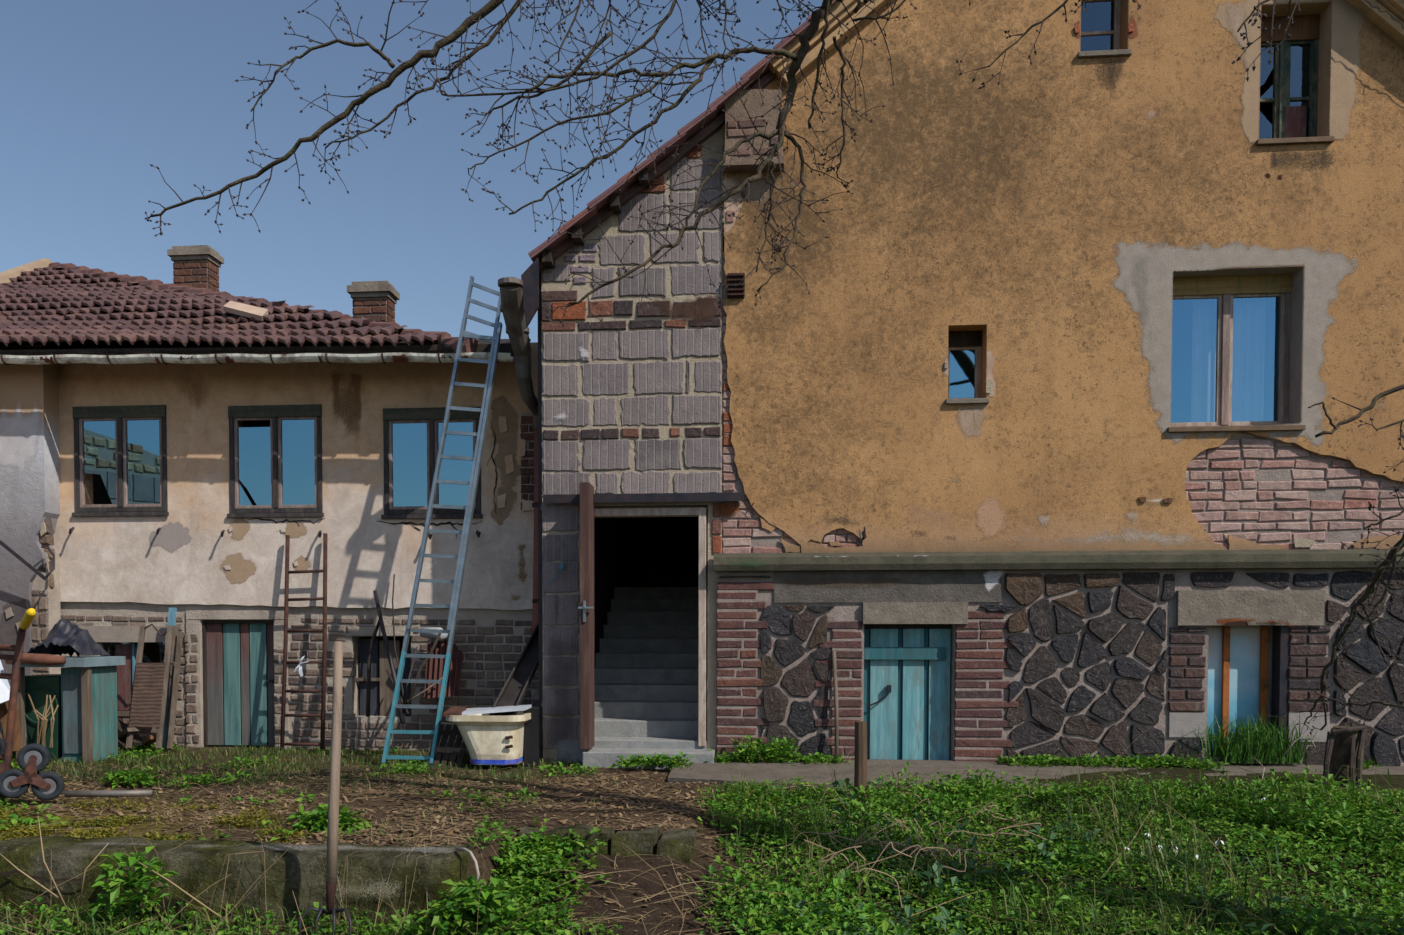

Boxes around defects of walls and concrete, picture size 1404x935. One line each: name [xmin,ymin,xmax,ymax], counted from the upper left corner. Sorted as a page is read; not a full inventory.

flaking render [722,178,744,233]
water stain [330,370,365,448]
flaking render [469,368,534,525]
flaking render [722,251,866,553]
flaking render [985,349,996,398]
flaking render [1139,432,1404,550]
flaking render [149,522,191,554]
flaking render [220,518,257,585]